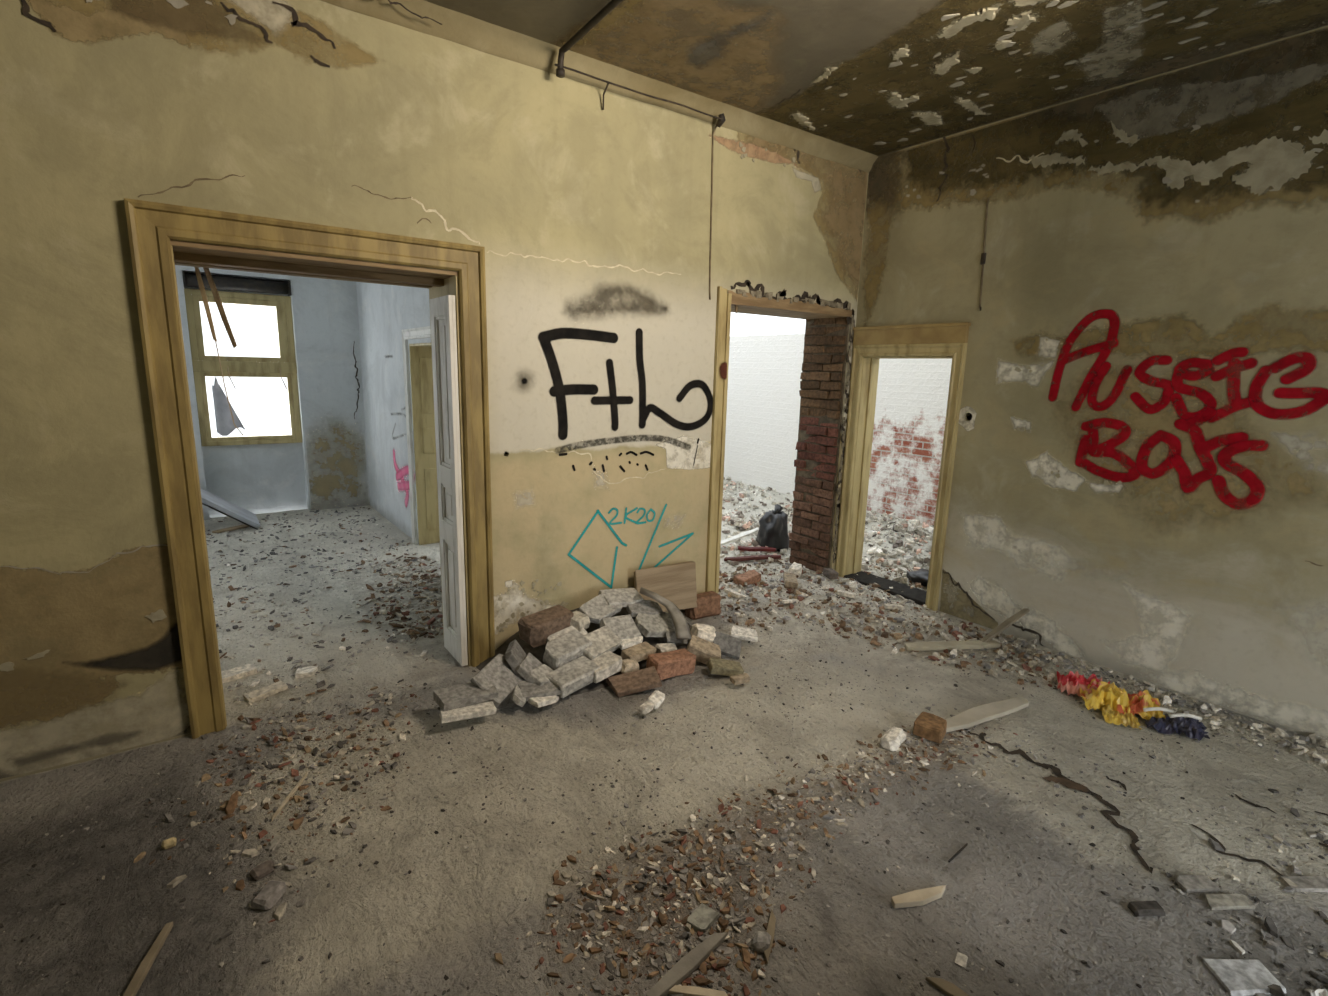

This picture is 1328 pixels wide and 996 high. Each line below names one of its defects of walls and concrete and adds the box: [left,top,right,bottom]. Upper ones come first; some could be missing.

crack [388,0,442,25]
crack [138,174,245,198]
crack [352,185,681,276]
peeling [710,135,821,192]
water stain [559,0,1328,326]
peeling [503,436,711,484]
peeling [0,544,190,775]
crack [965,729,1153,874]